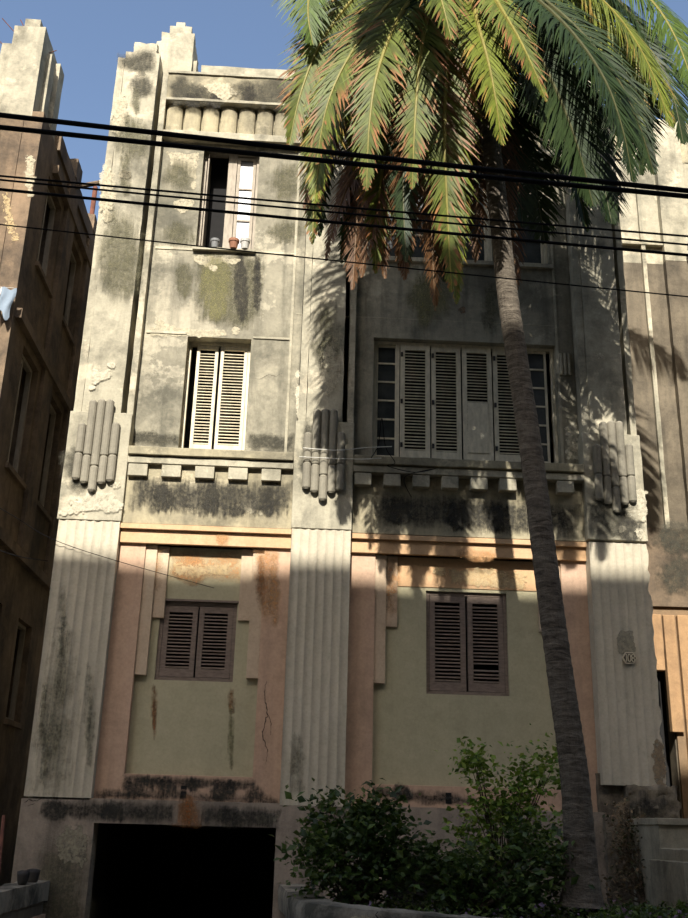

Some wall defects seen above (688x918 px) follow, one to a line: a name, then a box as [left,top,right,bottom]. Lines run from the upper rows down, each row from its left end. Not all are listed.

leakage [116,51,155,195]
leakage [176,253,261,326]
leakage [132,478,290,516]
leakage [374,495,529,532]
crack [262,681,271,761]
leakage [41,775,278,827]